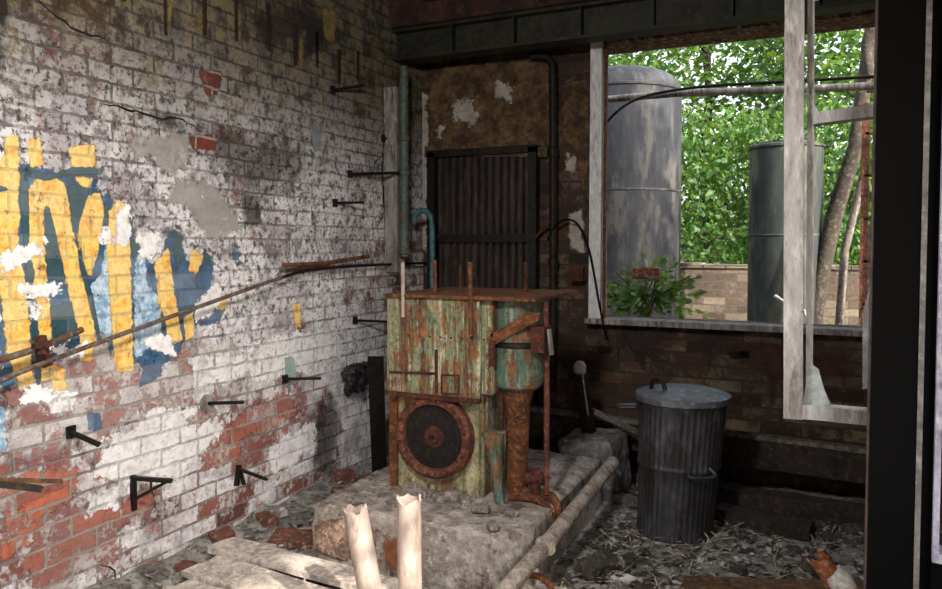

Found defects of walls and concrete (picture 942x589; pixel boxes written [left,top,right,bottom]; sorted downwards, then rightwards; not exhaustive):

crack [38,0,105,40]
peeling [495,79,515,104]
crack [104,104,202,136]
spalling [189,134,218,150]
peeling [161,178,243,240]
peeling [0,236,49,273]
peeling [97,203,162,266]
peeling [16,281,63,321]
peeling [194,282,225,323]
peeling [0,332,297,589]
spalling [266,517,352,561]